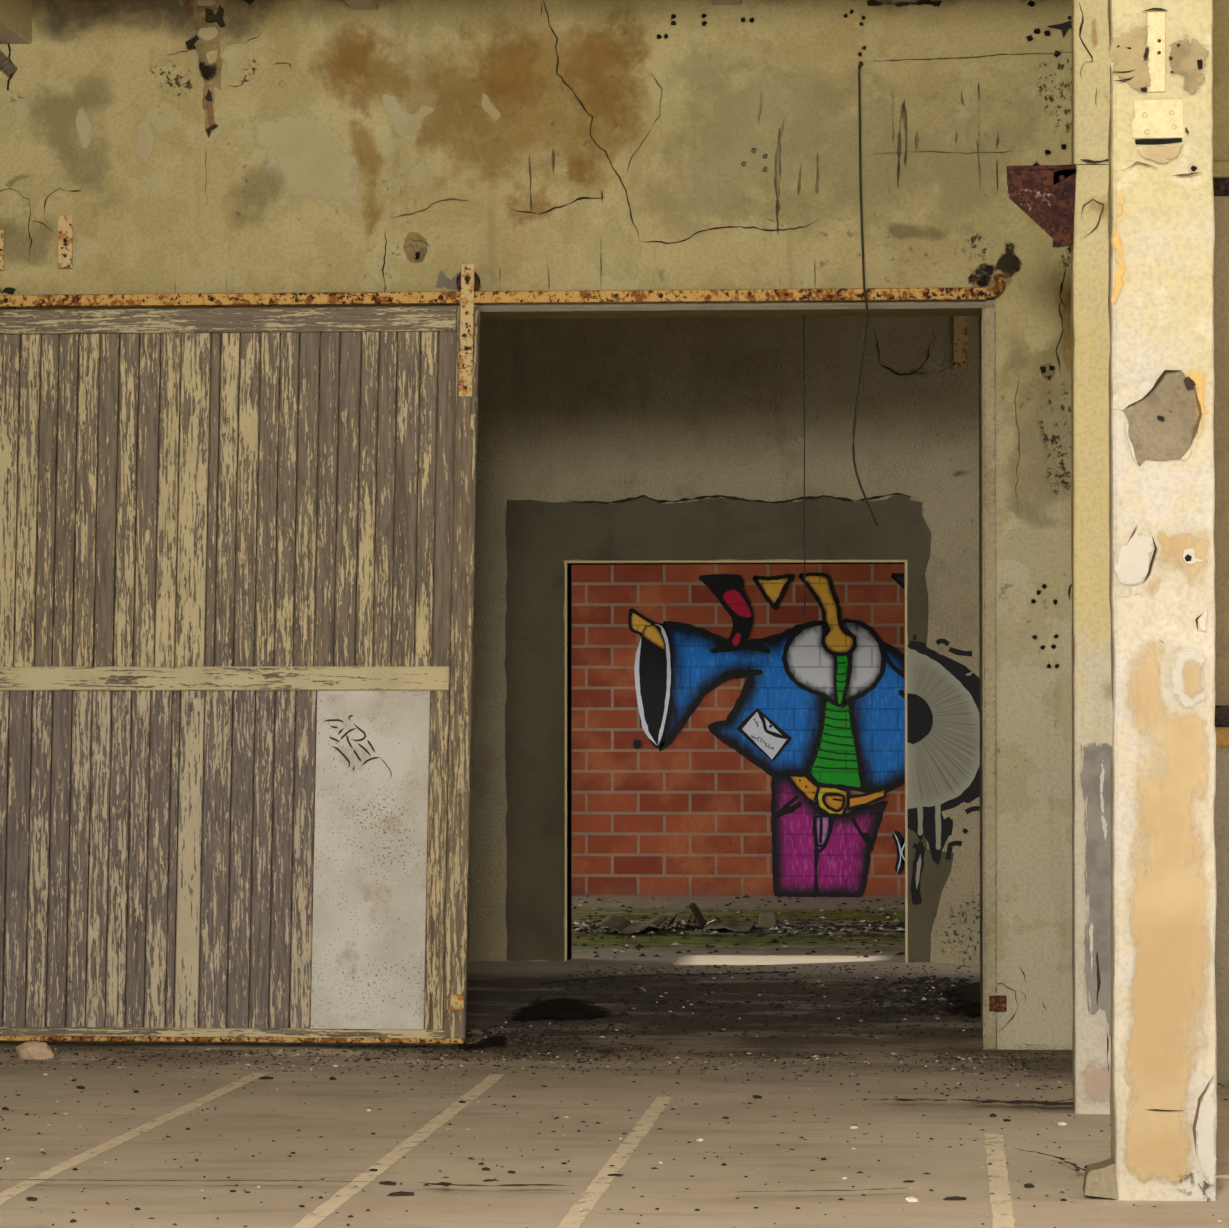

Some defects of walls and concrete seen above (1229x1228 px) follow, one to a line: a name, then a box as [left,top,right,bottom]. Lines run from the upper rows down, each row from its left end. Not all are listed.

flaking render [178,0,246,138]
crack [515,0,819,244]
flaking render [1108,8,1168,92]
flaking render [1169,35,1209,94]
flaking render [1113,370,1202,467]
peeling [504,494,931,961]
peeling [908,828,954,963]
peeling [1192,1076,1216,1186]